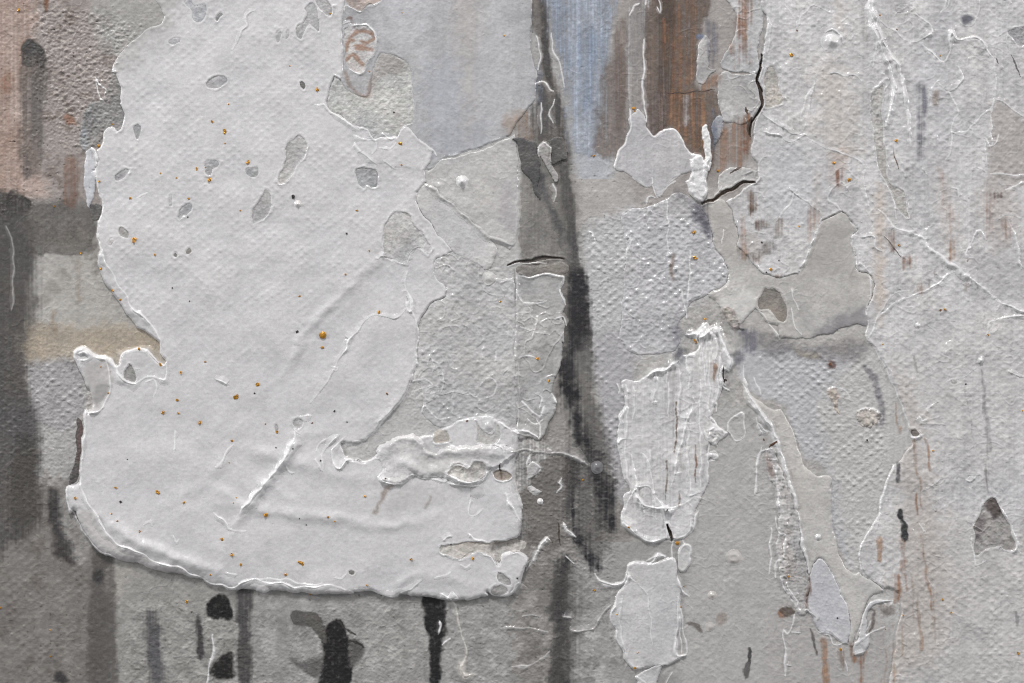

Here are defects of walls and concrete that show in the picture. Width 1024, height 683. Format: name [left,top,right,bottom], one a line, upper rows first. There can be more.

peeling [80,71,141,152]
peeling [275,0,414,188]
corrosion [640,0,750,171]
crack [745,54,764,137]
spalling [89,204,102,221]
spalling [375,212,431,266]
crack [507,256,565,266]
crack [701,167,756,205]
spalling [758,288,787,322]
peeling [69,417,83,485]
spalling [974,498,1016,555]
peeling [440,533,527,596]